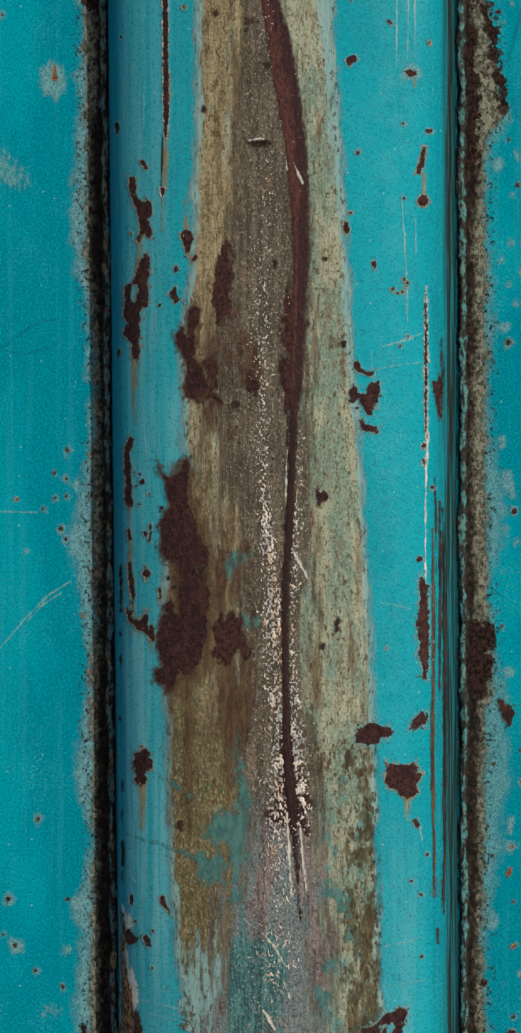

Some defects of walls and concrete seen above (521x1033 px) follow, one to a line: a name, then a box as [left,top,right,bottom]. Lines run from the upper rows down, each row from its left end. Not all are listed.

peeling [141,560,171,614]
rust [74,0,261,1033]
peeling [158,0,386,1033]
rust [244,0,316,922]
rust [348,360,382,437]
rust [345,718,395,769]
rust [359,1005,410,1033]
rust [383,0,517,1033]